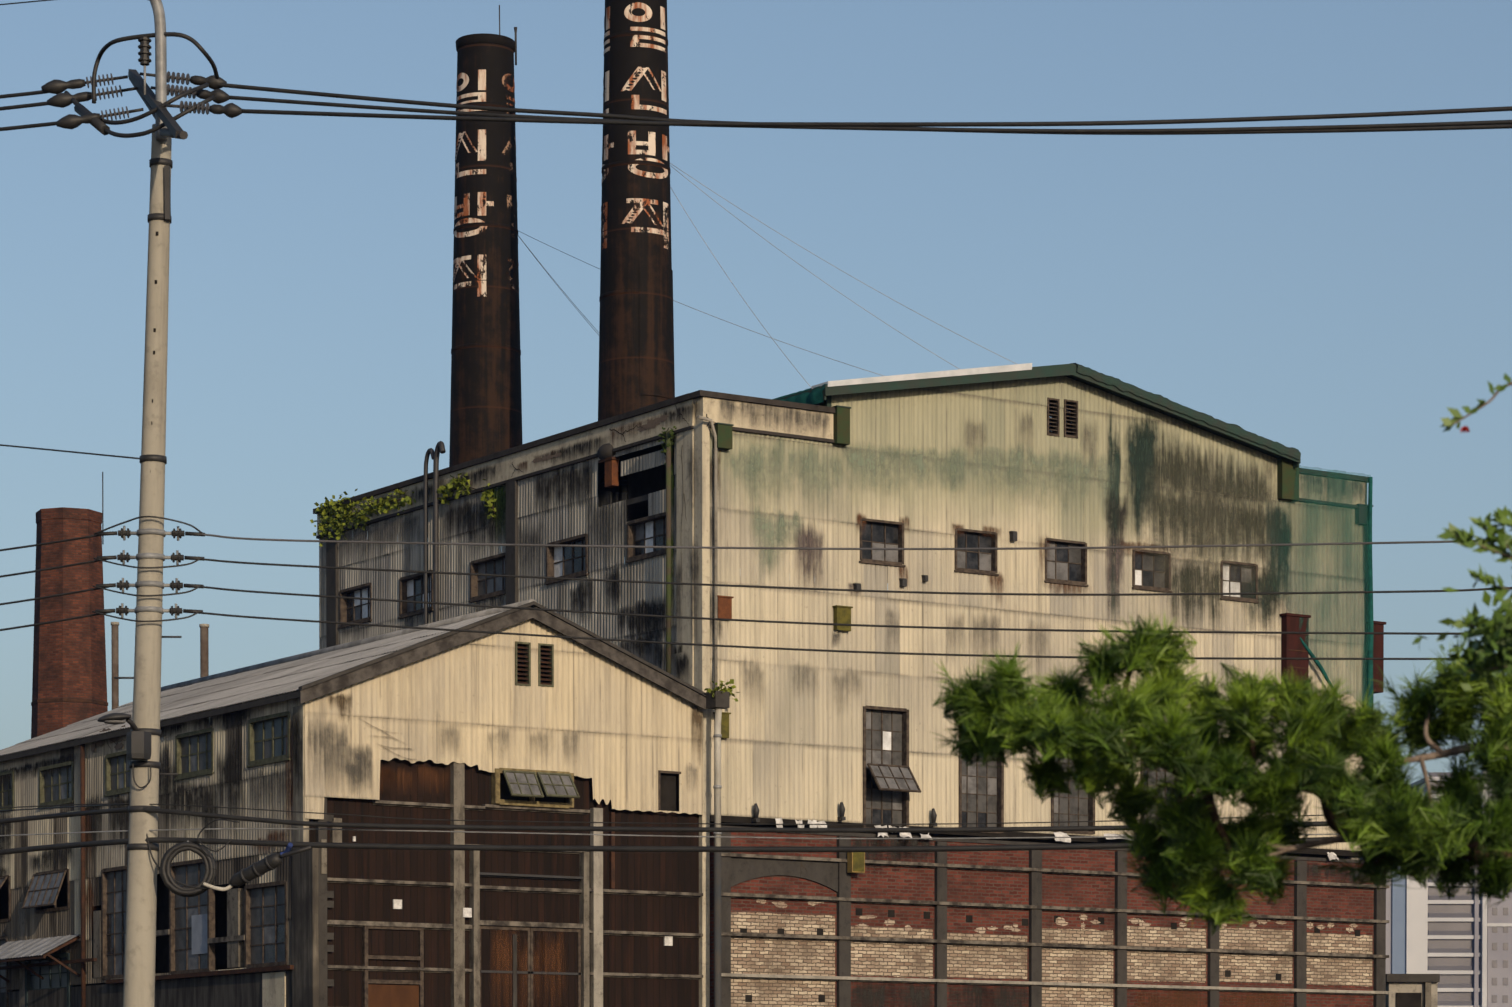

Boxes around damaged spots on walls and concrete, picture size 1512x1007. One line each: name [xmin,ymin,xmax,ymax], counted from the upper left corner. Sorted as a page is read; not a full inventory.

damp [720,399,827,428]
damp [570,516,720,679]
damp [671,414,1291,622]
peeling [731,899,1372,1007]